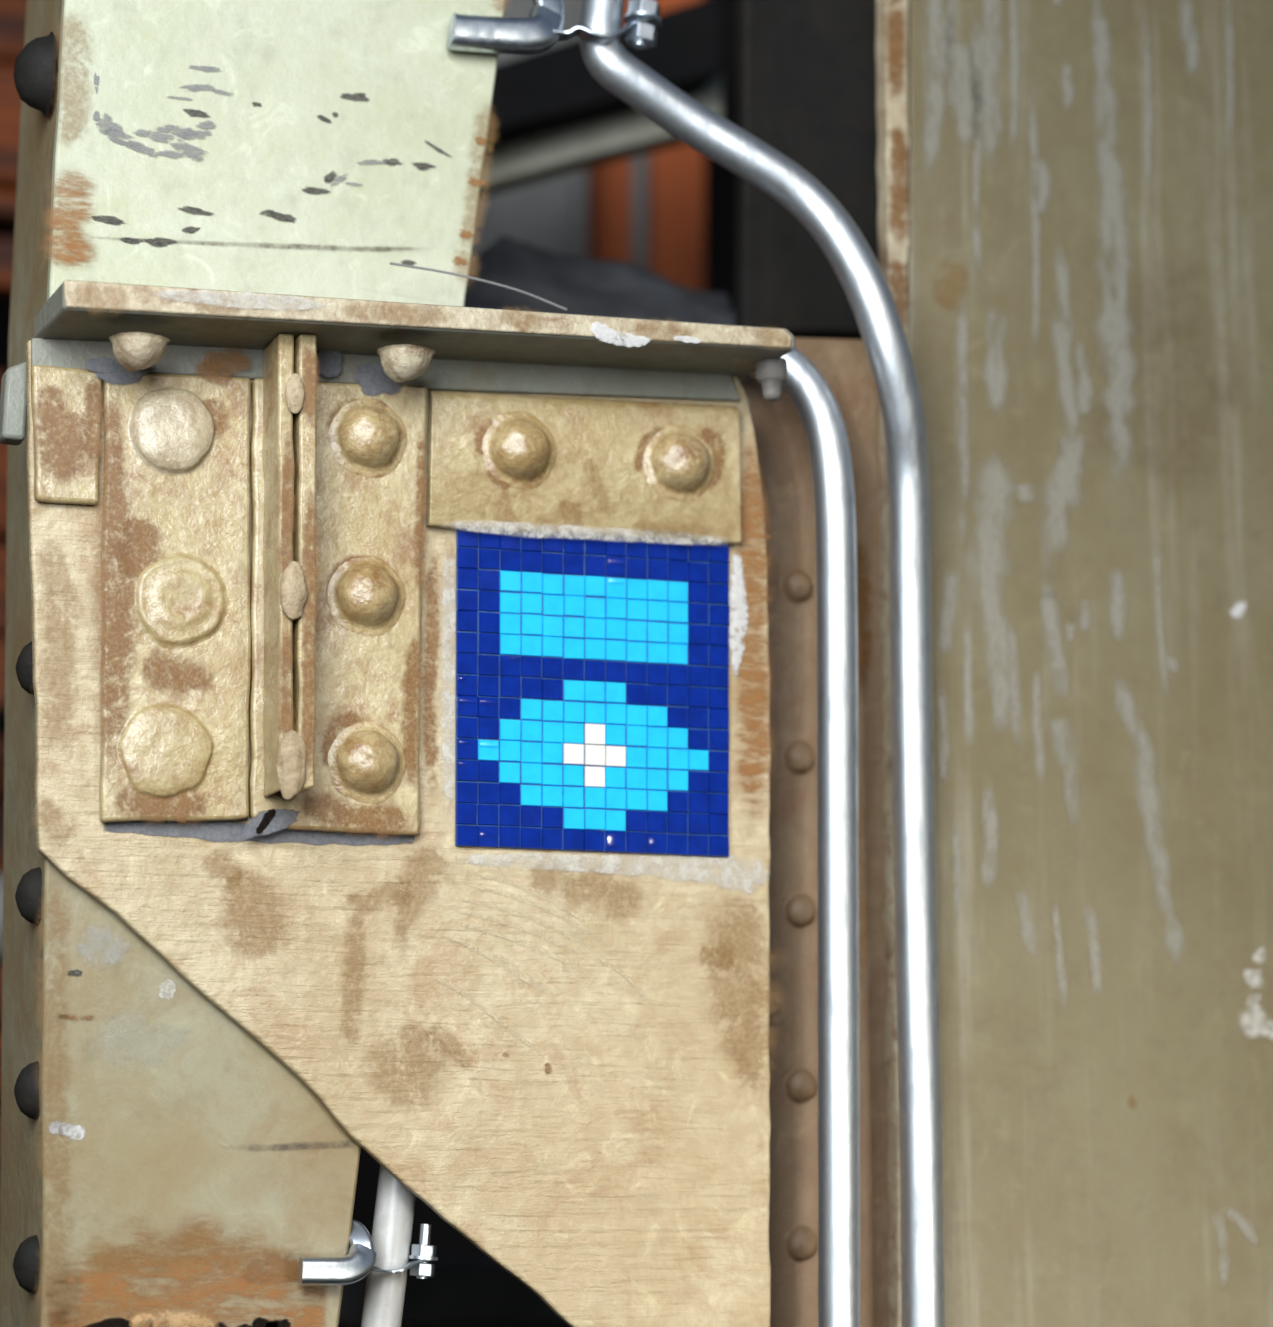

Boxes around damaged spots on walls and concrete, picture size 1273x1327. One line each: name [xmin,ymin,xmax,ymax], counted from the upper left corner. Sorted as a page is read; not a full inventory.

peeling [93,65,233,161]
peeling [317,93,369,123]
peeling [302,140,451,194]
corrosion [48,176,91,265]
peeling [92,206,213,247]
peeling [260,209,296,223]
damp [925,0,1133,818]
damp [1117,685,1182,956]
damp [1053,909,1066,997]
corrosion [49,1229,324,1327]